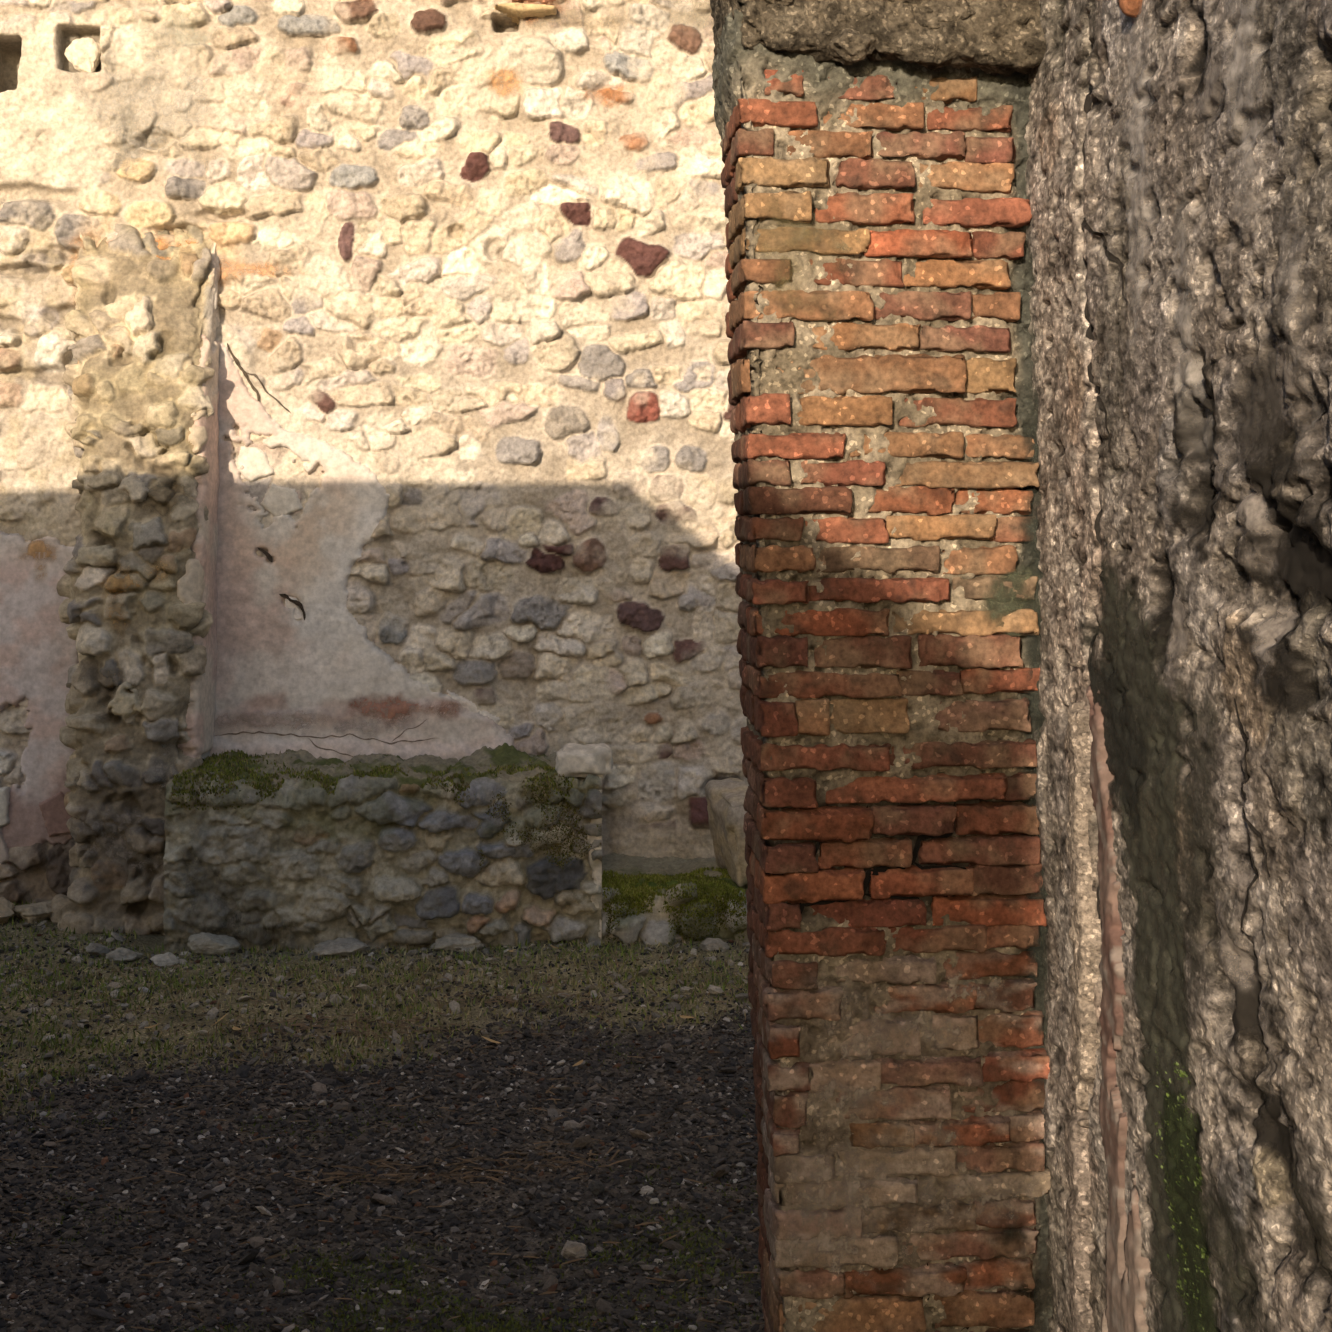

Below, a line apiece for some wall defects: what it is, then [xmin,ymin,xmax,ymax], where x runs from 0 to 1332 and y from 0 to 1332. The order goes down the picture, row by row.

crack [1082,91,1092,163]
crack [1081,218,1126,300]
crack [1084,298,1111,453]
peeling [118,335,514,762]
crack [1094,509,1120,630]
peeling [0,530,143,864]
crack [1234,699,1270,933]
crack [1094,885,1102,919]